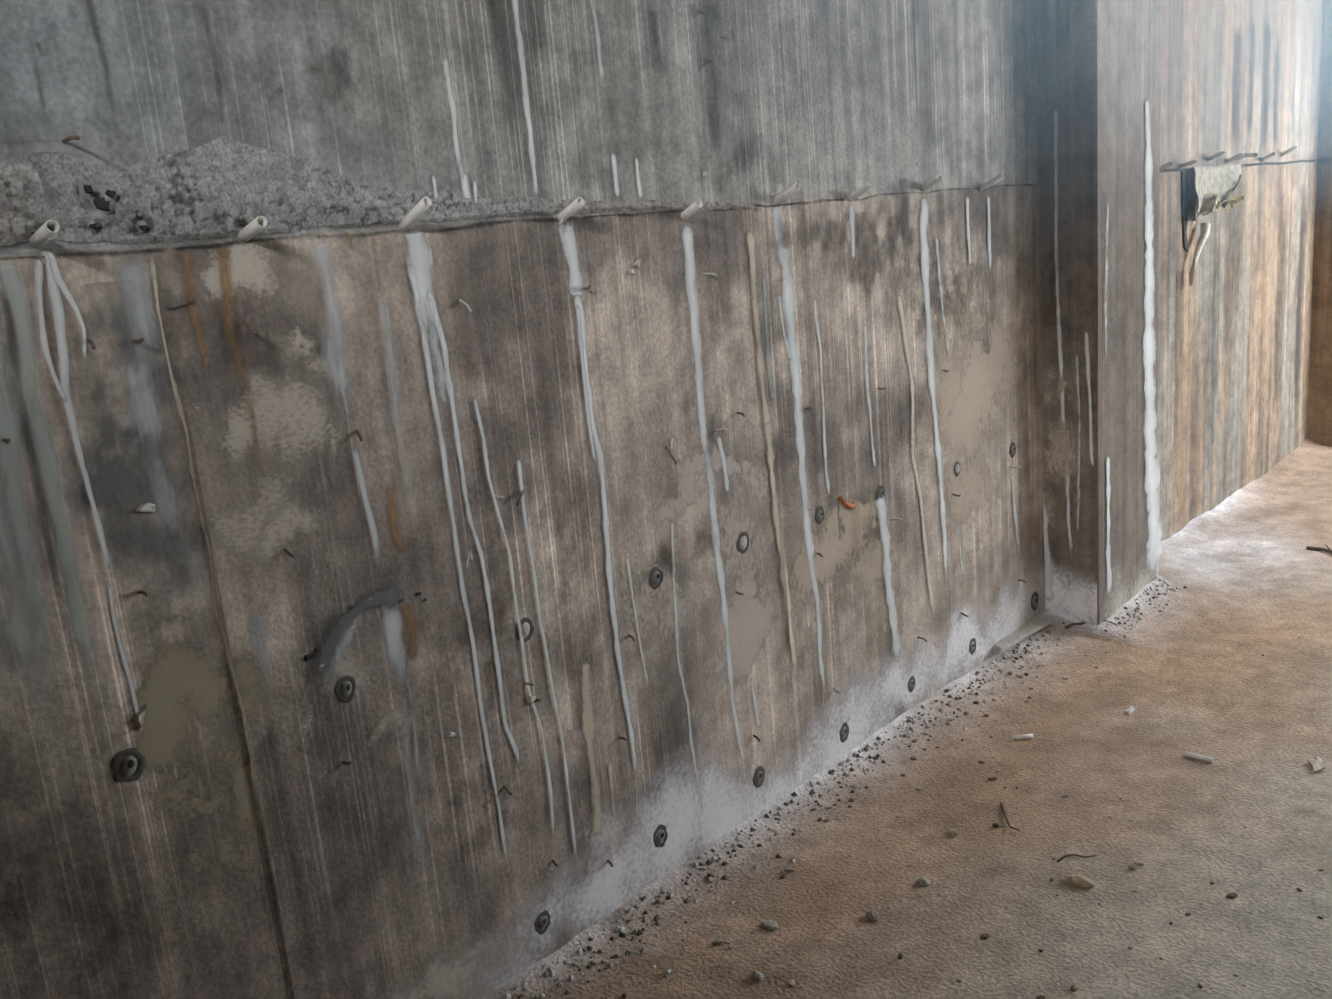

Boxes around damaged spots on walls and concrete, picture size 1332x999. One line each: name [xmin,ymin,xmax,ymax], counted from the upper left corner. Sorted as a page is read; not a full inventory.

corrosion [220,250,241,368]
water stain [316,244,345,394]
water stain [0,252,179,662]
water stain [354,452,378,553]
water stain [392,101,1162,999]
water stain [108,586,142,730]
water stain [382,605,405,678]